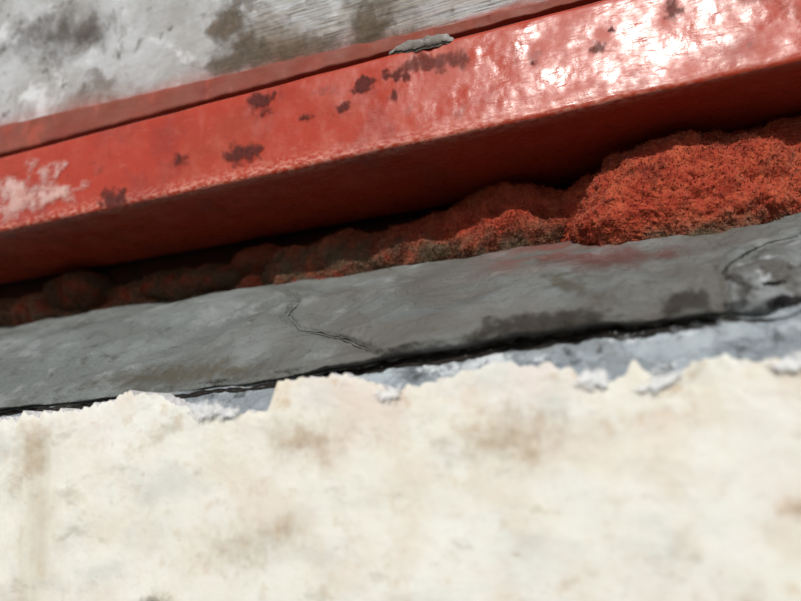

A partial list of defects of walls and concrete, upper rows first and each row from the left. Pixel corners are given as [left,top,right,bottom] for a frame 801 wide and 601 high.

peeling [0,163,68,218]
crack [0,401,107,416]
peeling [0,303,801,423]
crack [174,294,801,399]